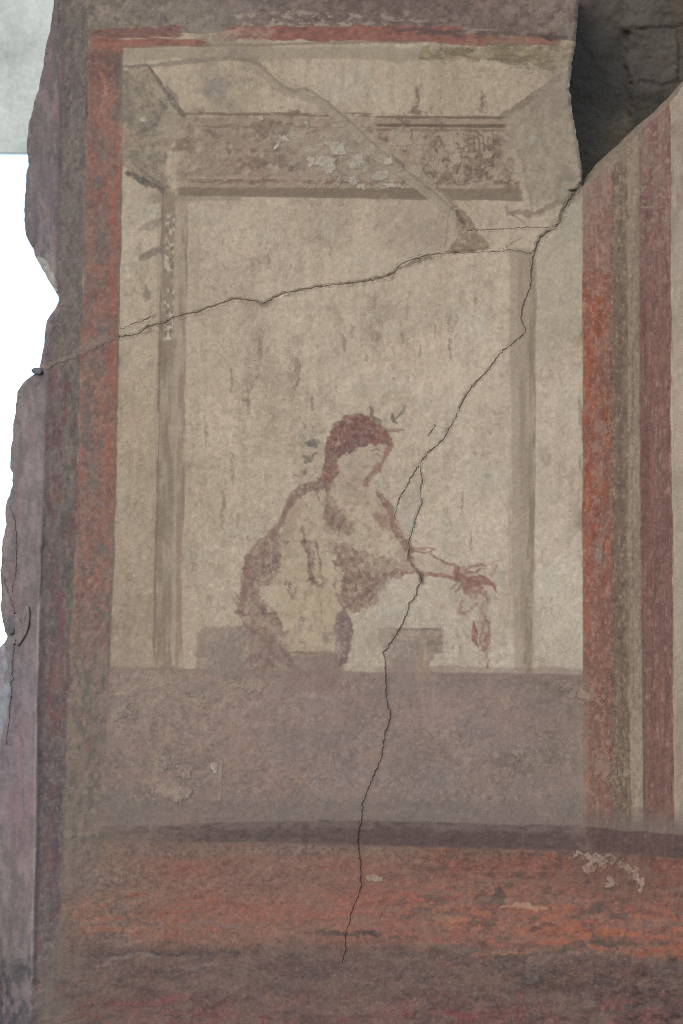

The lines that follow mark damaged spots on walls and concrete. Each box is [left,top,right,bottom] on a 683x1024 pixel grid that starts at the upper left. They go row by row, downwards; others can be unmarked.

peeling [252,114,404,192]
crack [40,180,584,967]
peeling [566,847,657,908]